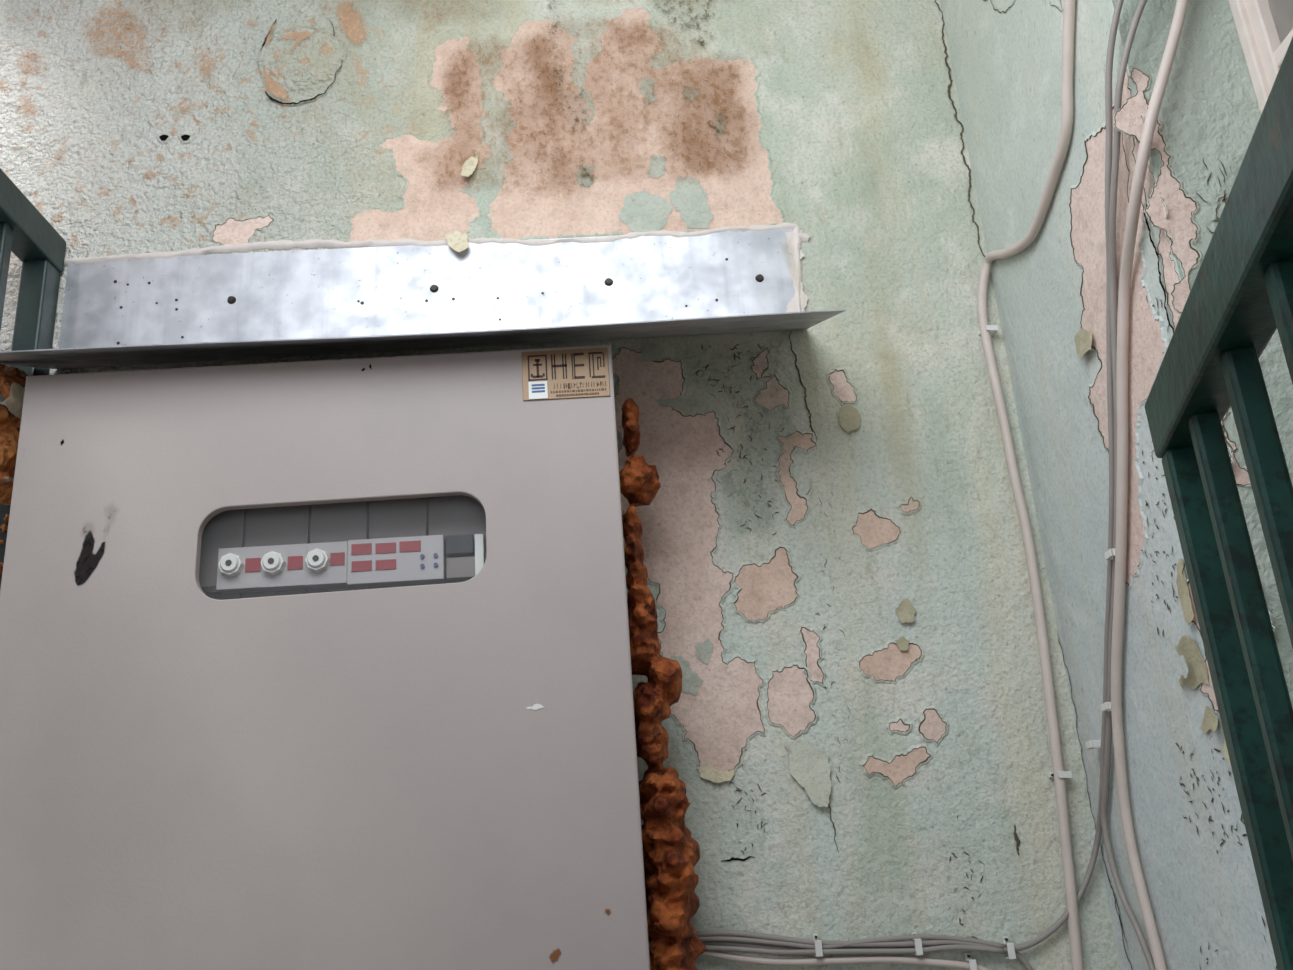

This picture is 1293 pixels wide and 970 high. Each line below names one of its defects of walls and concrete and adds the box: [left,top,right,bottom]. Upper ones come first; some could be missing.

peeling [346,5,786,252]
crack [935,0,985,257]
peeling [612,346,831,807]
peeling [825,368,861,433]
peeling [849,494,922,552]
peeling [856,598,925,685]
peeling [859,706,950,790]
peeling [1069,68,1204,589]
crack [1122,133,1174,353]
crack [1142,450,1185,636]
peeling [1172,558,1231,766]
peeling [1221,407,1252,489]